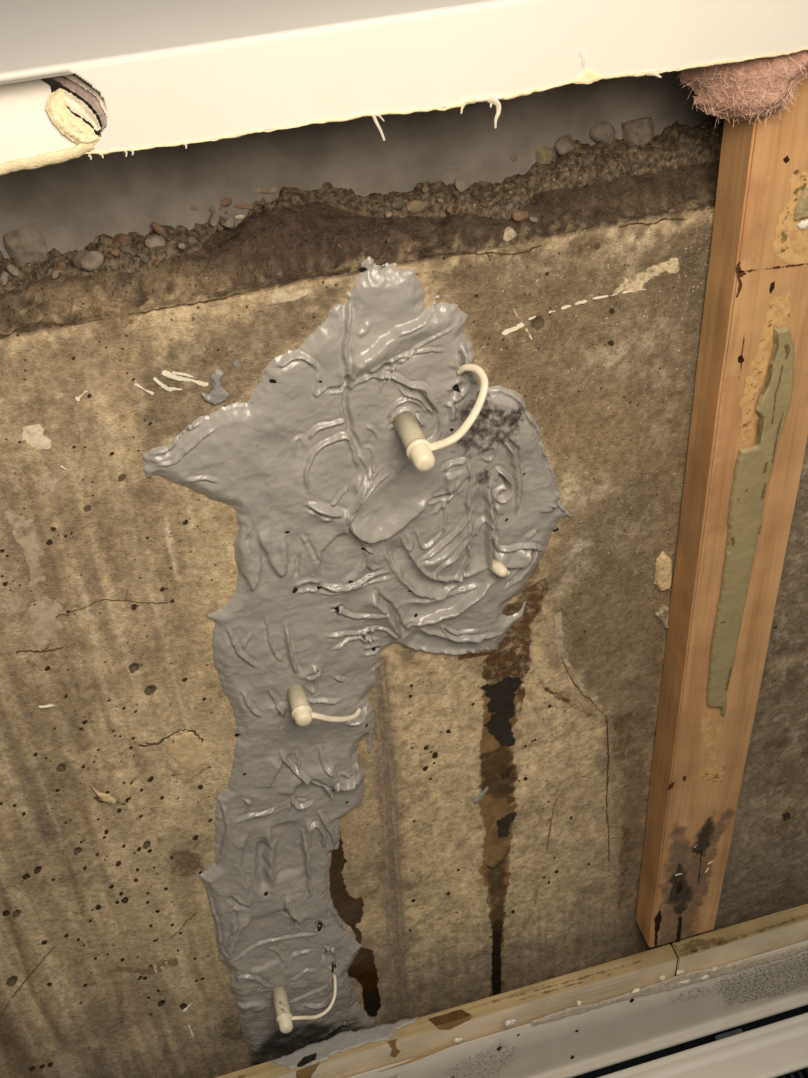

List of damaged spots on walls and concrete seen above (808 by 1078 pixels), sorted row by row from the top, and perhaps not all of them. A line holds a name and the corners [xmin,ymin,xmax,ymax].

spalling [0,74,108,176]
crack [561,656,616,862]
leakage [329,832,381,1017]
leakage [478,674,523,997]
leakage [657,811,734,944]
leakage [252,1022,362,1066]
leakage [296,1062,320,1078]
leakage [387,1039,400,1057]